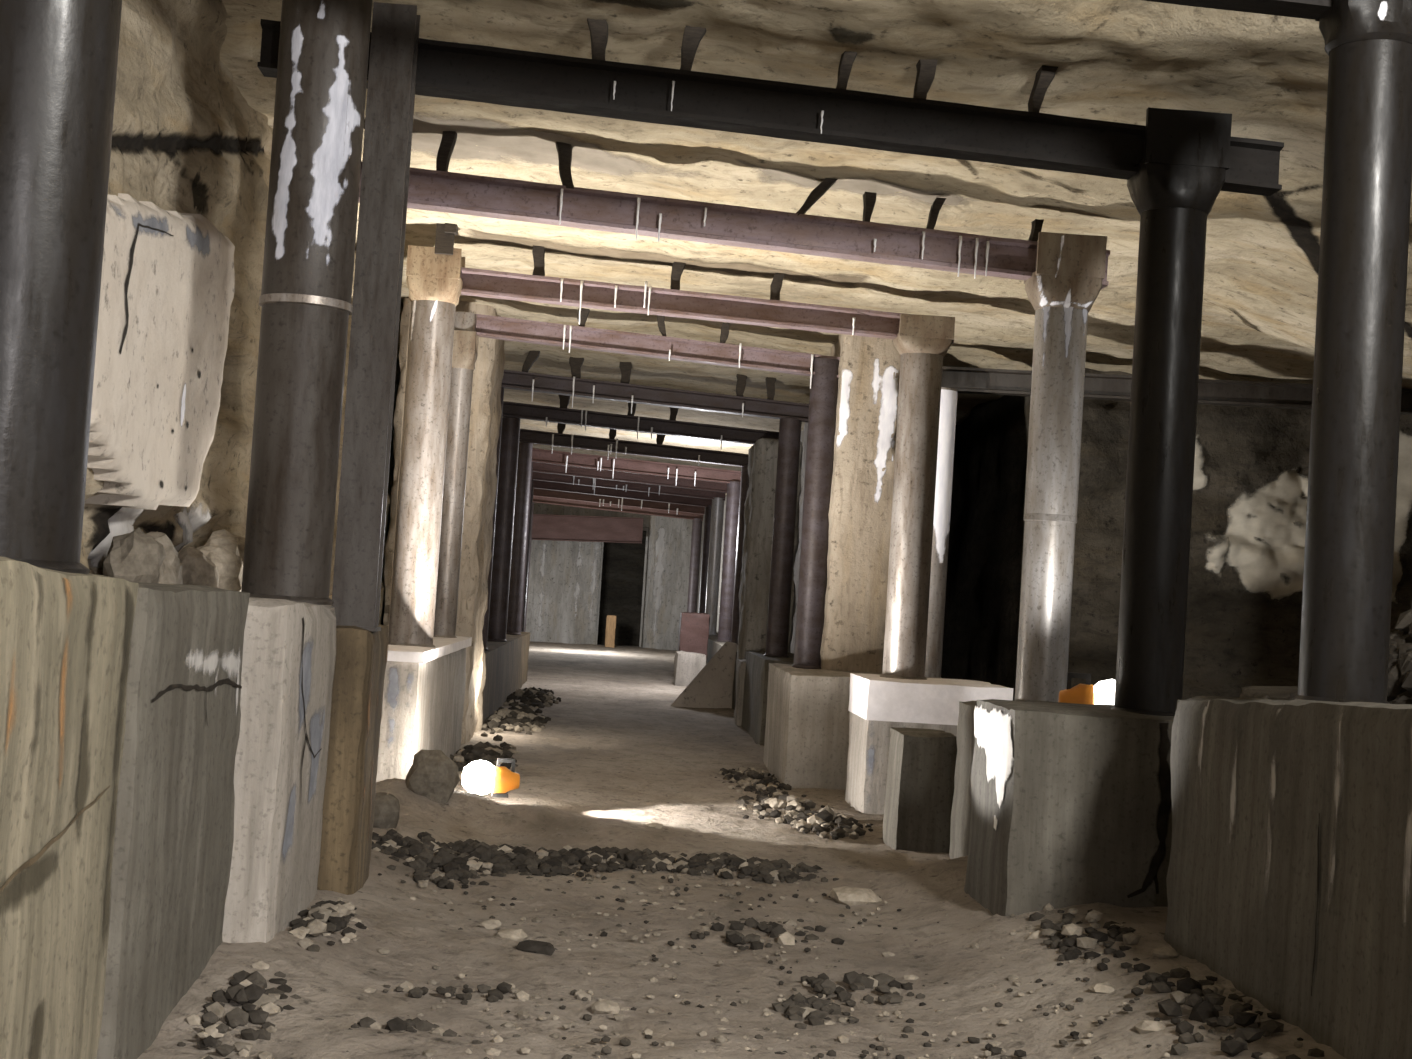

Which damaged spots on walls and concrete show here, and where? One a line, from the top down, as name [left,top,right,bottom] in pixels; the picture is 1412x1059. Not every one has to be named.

crack [119,223,174,354]
damp [836,369,853,446]
damp [872,359,898,502]
spalling [88,486,211,568]
crack [152,678,242,720]
crack [0,786,110,892]